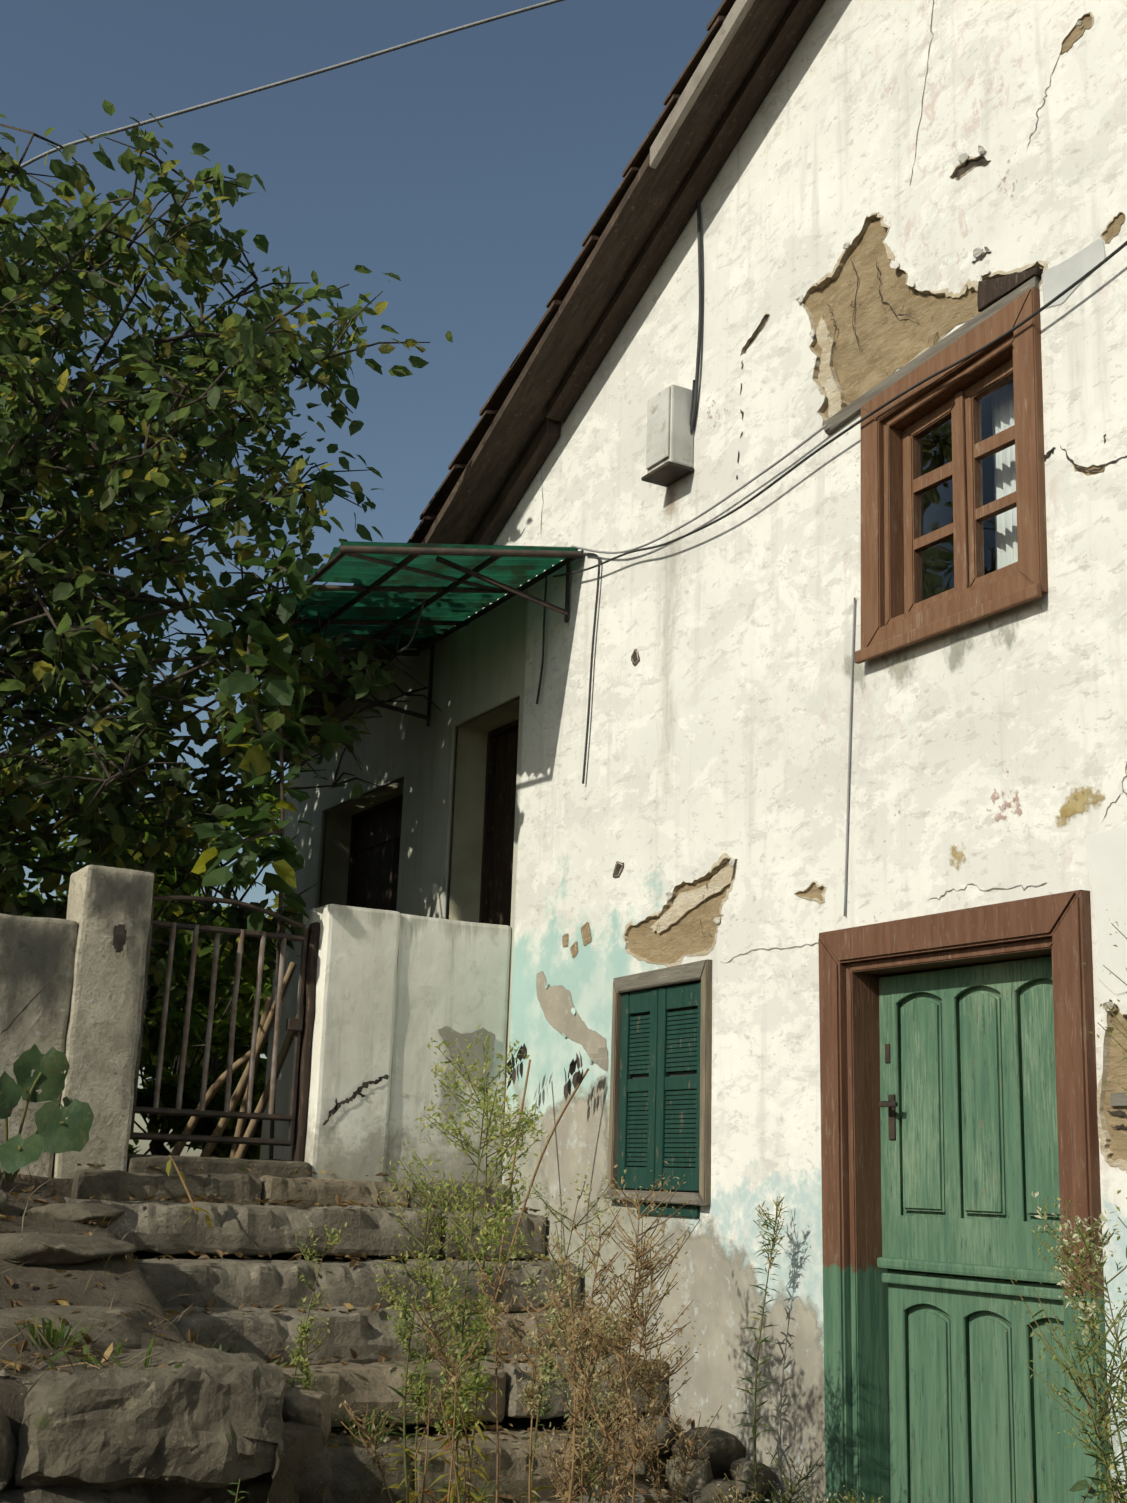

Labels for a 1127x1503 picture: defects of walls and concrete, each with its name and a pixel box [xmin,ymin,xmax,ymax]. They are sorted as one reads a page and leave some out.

flaking render [1027,12,1094,147]
flaking render [950,145,1017,196]
flaking render [796,212,1047,426]
crack [1044,434,1127,476]
crack [1101,763,1127,823]
water stain [93,868,147,934]
flaking render [623,853,738,968]
water stain [0,919,69,1034]
crack [323,1074,389,1125]
peeling [536,971,608,1223]
flaking render [1097,999,1127,1174]